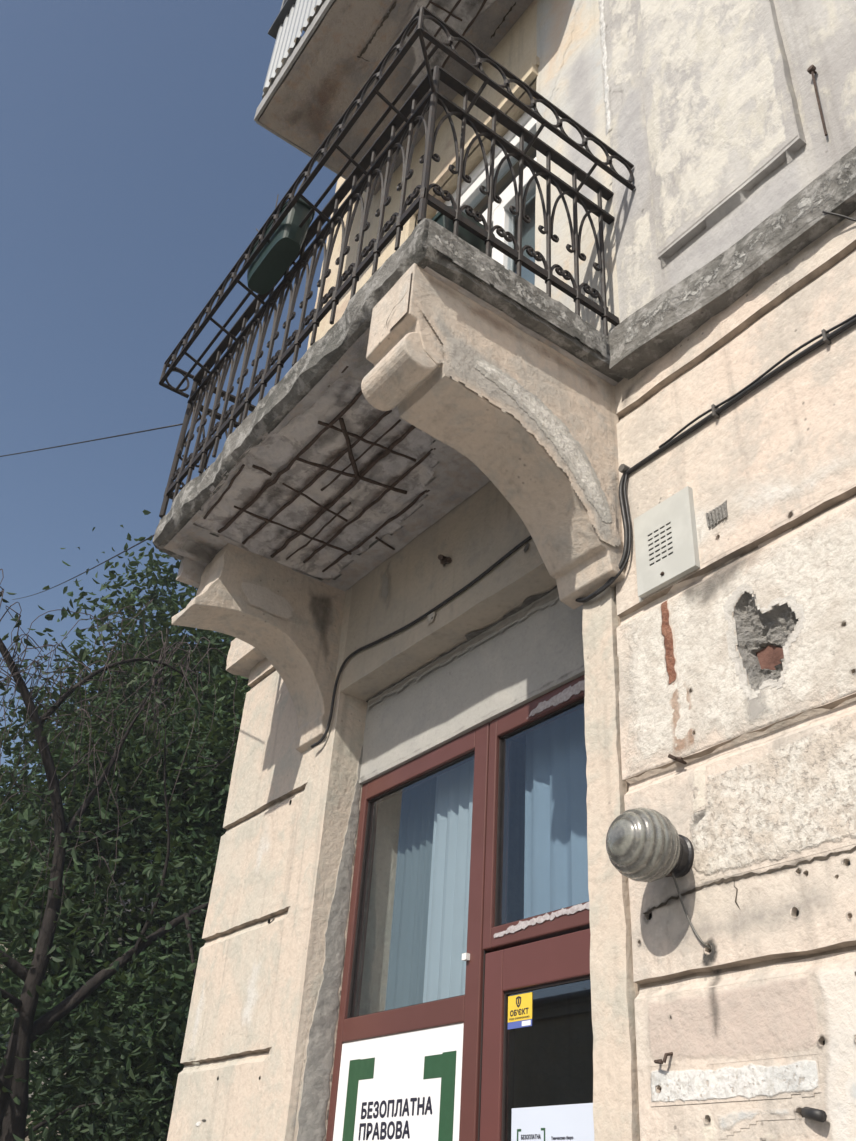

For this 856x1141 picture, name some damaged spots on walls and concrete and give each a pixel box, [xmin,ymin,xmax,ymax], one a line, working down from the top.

spalling [194,366,438,579]
peeling [366,269,856,883]